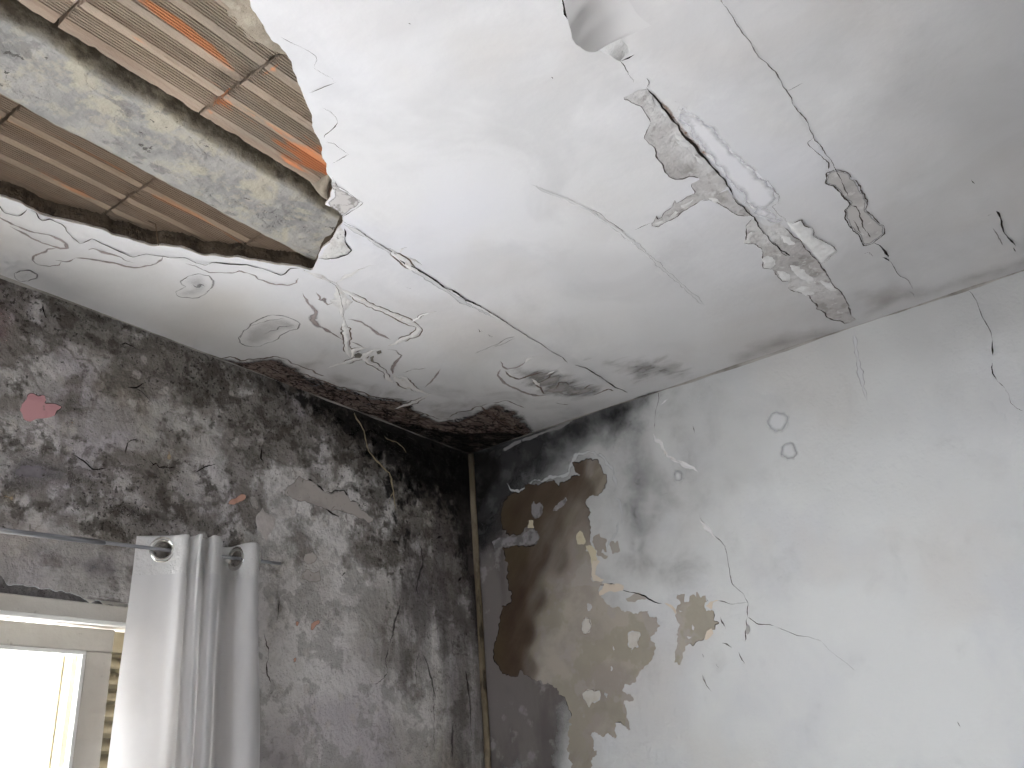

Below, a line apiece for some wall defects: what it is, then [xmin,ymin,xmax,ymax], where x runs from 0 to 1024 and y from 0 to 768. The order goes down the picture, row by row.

spalling [221,0,287,55]
crack [721,1,850,204]
crack [0,207,297,276]
spalling [0,143,358,270]
water stain [176,264,297,298]
crack [324,118,626,392]
peeling [624,89,856,324]
crack [871,243,915,297]
water stain [211,294,655,768]
peeling [492,458,660,768]
peeling [665,592,725,665]
crack [701,520,854,670]